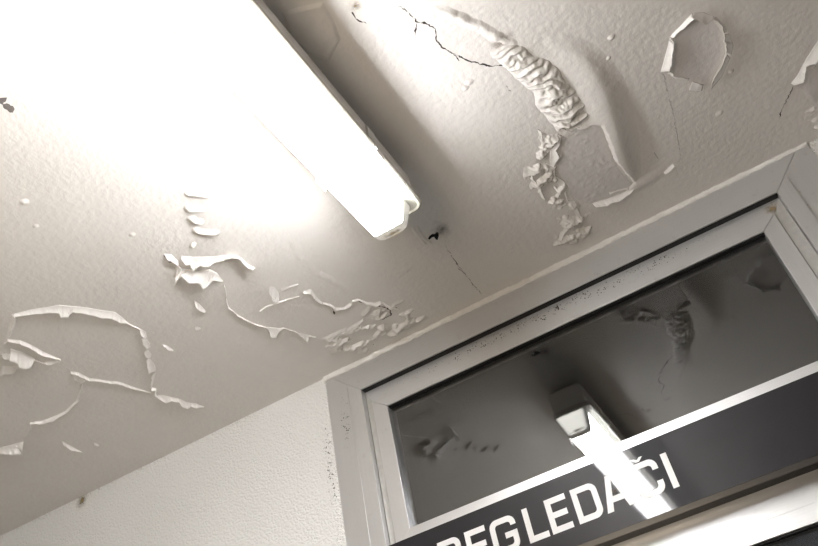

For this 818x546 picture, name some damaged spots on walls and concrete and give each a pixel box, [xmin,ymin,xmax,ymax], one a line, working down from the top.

crack [398,6,503,67]
peeling [660,12,734,92]
peeling [791,41,818,138]
spalling [523,125,634,247]
peeling [163,254,429,355]
peeling [0,305,203,456]